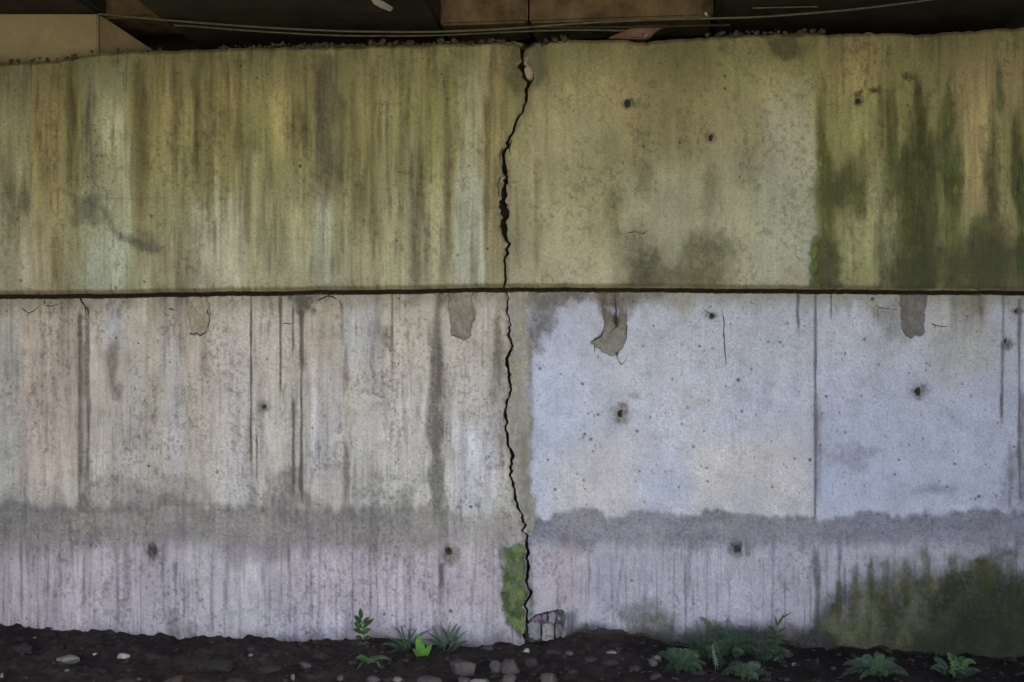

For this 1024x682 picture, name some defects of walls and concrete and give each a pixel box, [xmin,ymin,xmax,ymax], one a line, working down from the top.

peeling [187,297,211,336]
peeling [442,292,476,340]
crack [497,43,534,643]
peeling [591,292,627,365]
peeling [900,294,928,339]
damp [494,292,624,541]
damp [665,294,1024,543]
damp [571,624,612,635]
damp [626,557,831,650]